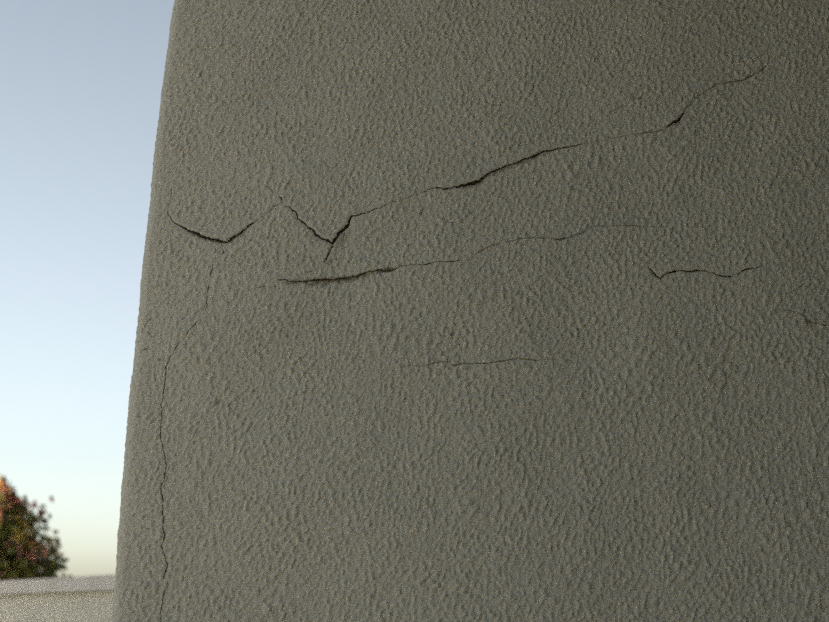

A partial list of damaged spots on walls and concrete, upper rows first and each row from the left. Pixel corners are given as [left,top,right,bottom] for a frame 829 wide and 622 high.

crack [608,54,784,139]
crack [648,266,773,279]
crack [160,143,653,622]